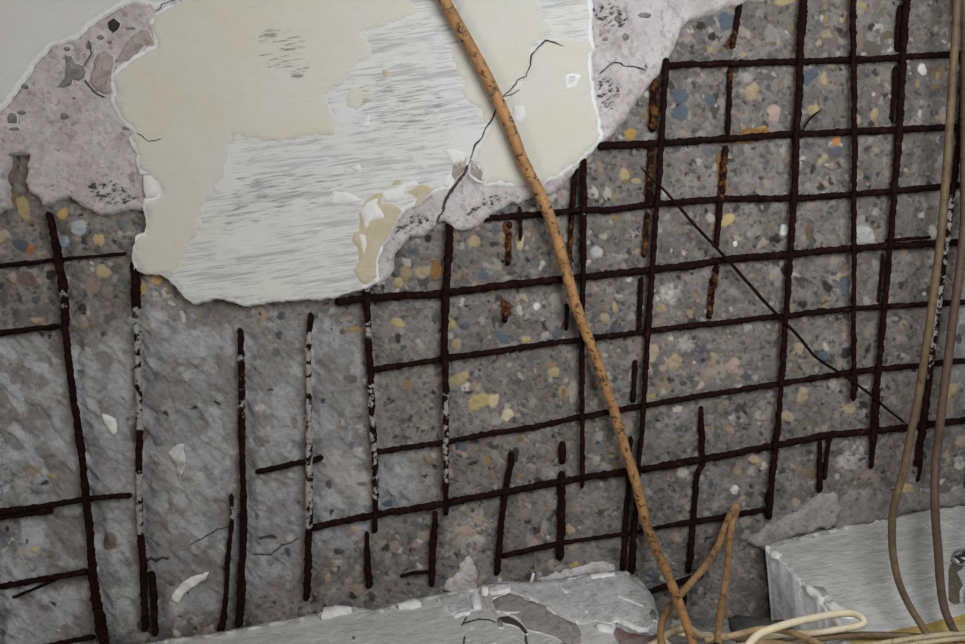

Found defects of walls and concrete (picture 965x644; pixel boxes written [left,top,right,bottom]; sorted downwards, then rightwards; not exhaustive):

spalling [0,3,681,644]
crack [437,39,563,222]
rust [717,128,770,193]
spalling [542,0,965,632]